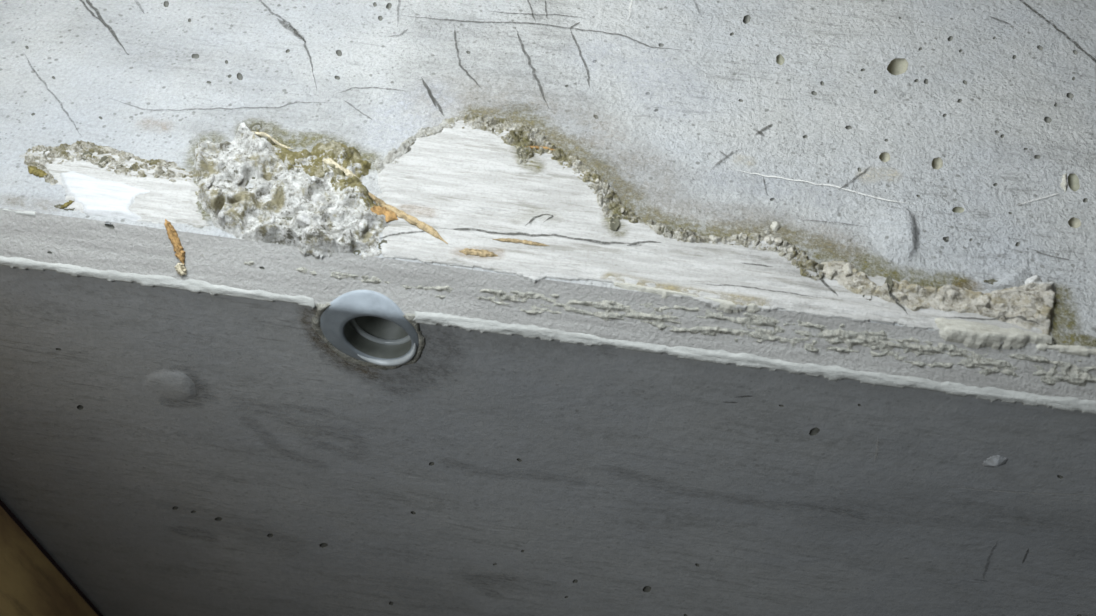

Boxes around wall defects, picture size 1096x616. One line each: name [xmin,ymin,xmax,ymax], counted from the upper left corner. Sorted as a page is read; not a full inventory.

spalling [19,140,209,228]
spalling [374,113,1056,350]